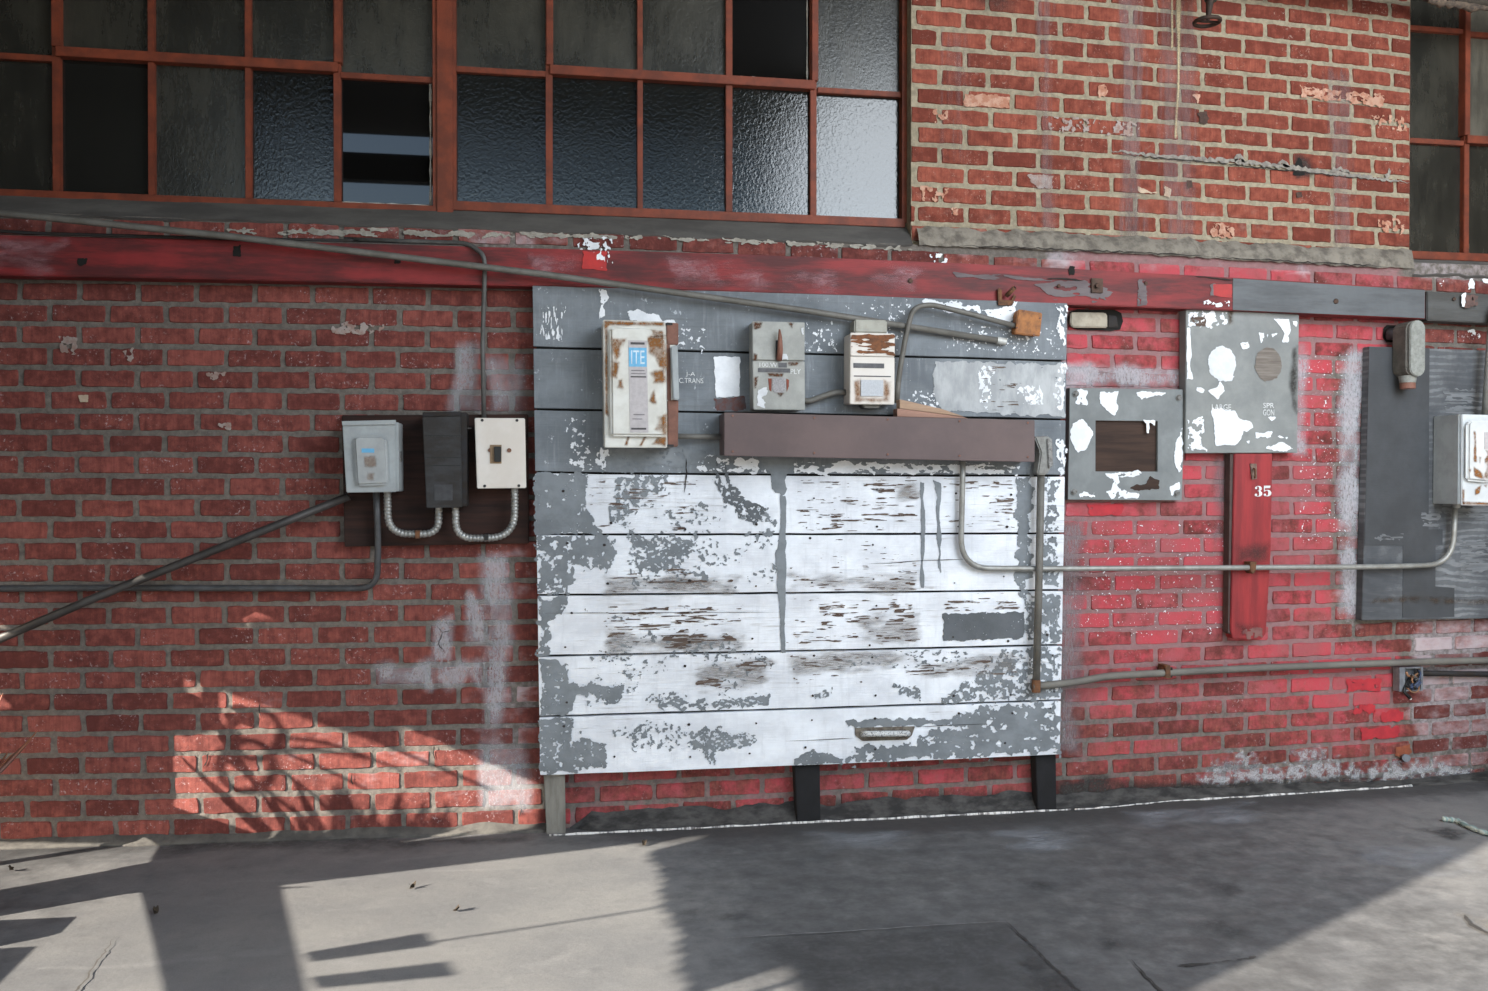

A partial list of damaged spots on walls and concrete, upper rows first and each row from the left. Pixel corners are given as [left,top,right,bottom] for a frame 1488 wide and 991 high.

peeling [1461,278,1488,308]
peeling [277,186,1414,776]
water stain [411,561,505,711]
water stain [1060,776,1149,795]
water stain [1167,750,1469,788]